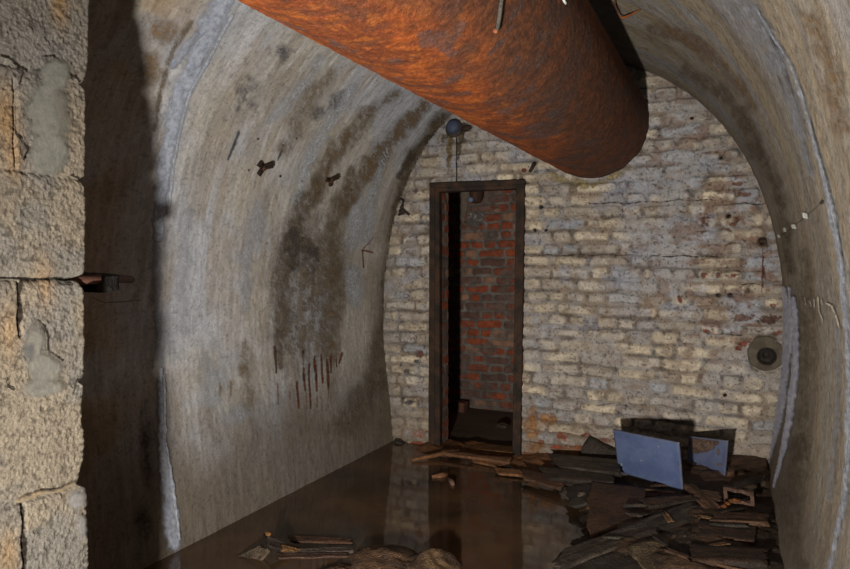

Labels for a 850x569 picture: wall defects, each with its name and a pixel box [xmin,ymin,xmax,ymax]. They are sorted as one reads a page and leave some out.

crack [0,55,28,84]
crack [13,106,29,160]
water stain [144,0,234,302]
corrosion [441,132,463,167]
water stain [270,60,448,369]
water stain [734,0,850,569]
water stain [141,312,181,550]
corrosion [289,350,343,409]
water stain [337,317,386,431]